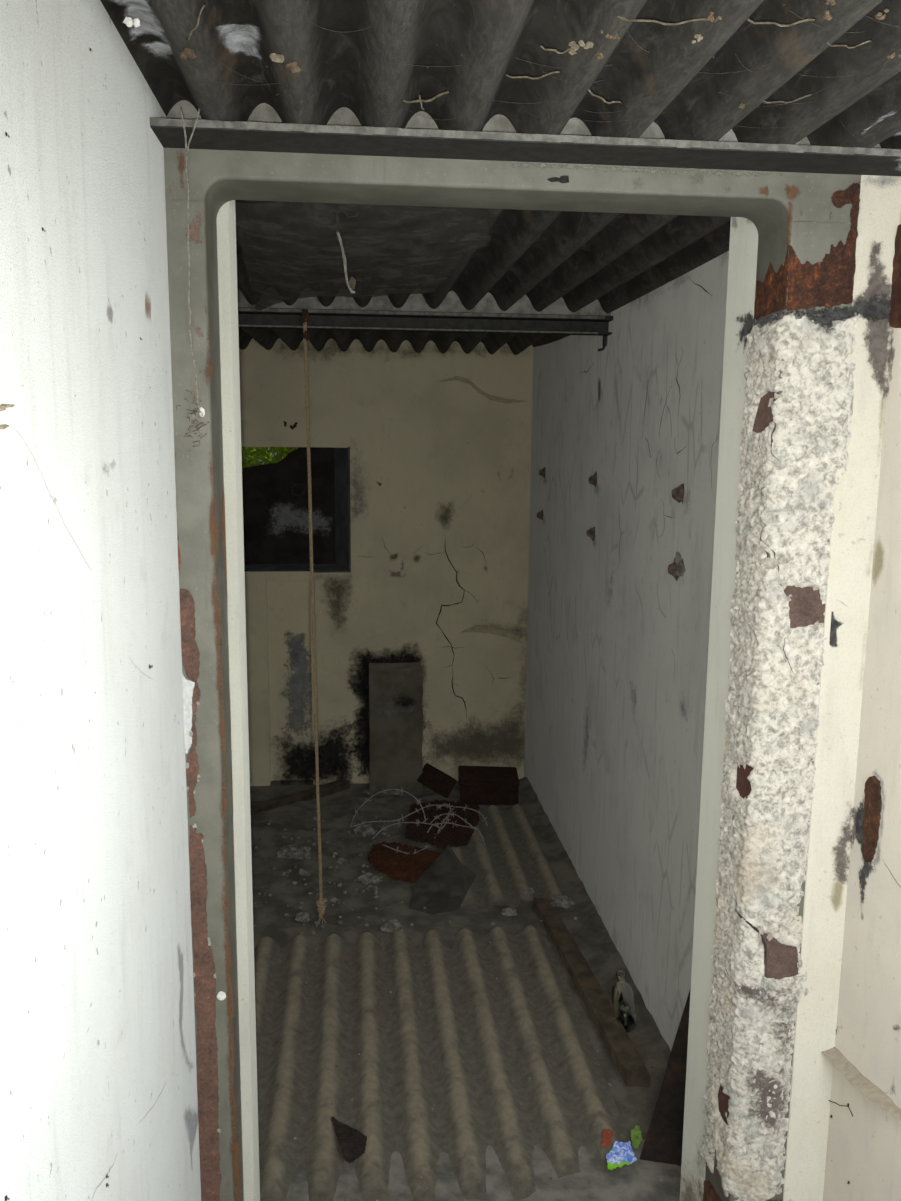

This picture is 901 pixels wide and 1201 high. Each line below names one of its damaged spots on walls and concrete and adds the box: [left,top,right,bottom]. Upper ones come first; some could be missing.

corrosion [754,183,861,321]
spalling [746,391,781,436]
corrosion [210,494,232,761]
crack [358,541,510,719]
spalling [755,546,826,632]
spalling [736,761,754,804]
spalling [757,927,803,983]
corrosion [223,884,240,1201]
spalling [712,1084,730,1130]
corrosion [703,1180,722,1201]